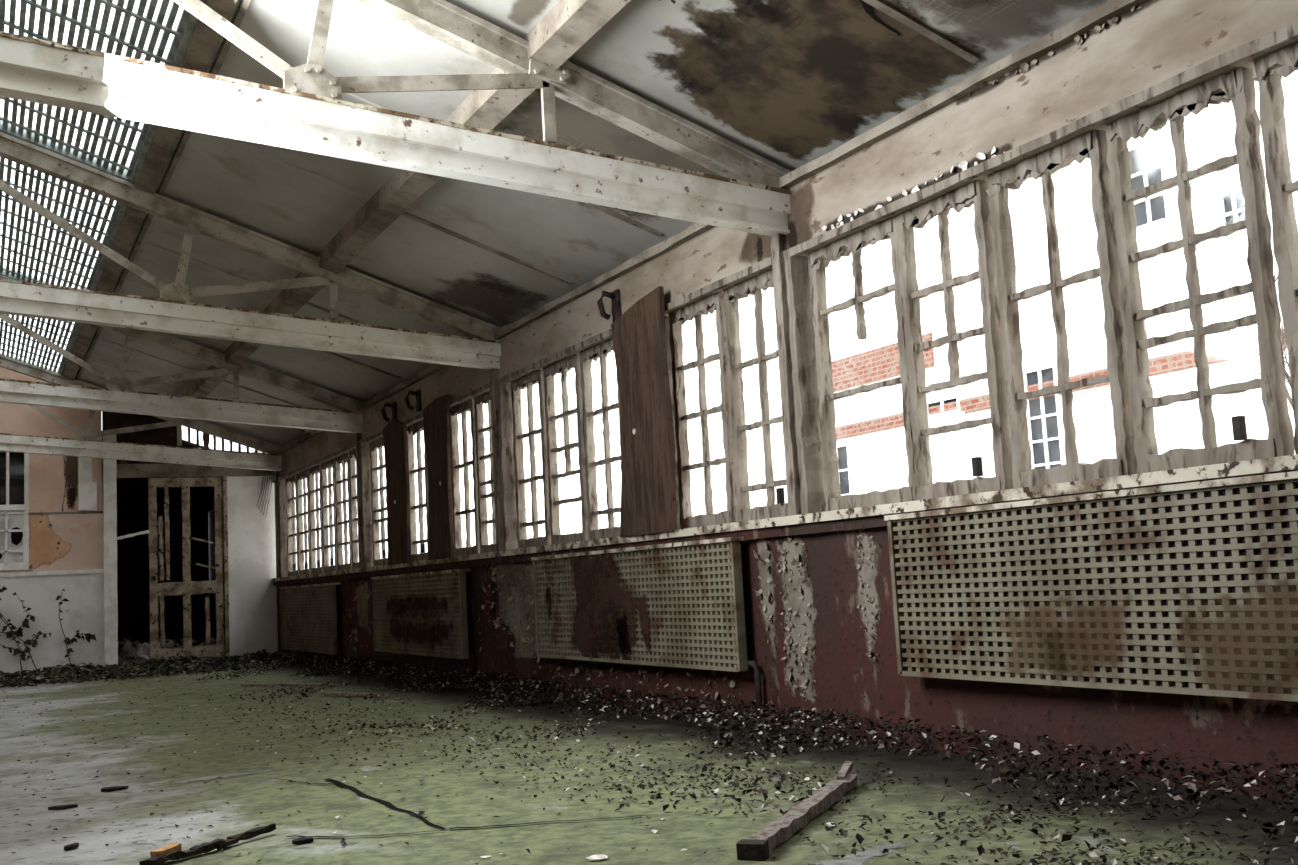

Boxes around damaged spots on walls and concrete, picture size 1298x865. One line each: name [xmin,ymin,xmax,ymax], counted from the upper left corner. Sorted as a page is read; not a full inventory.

water stain [509,0,547,25]
water stain [648,0,1099,160]
peeling [29,513,72,571]